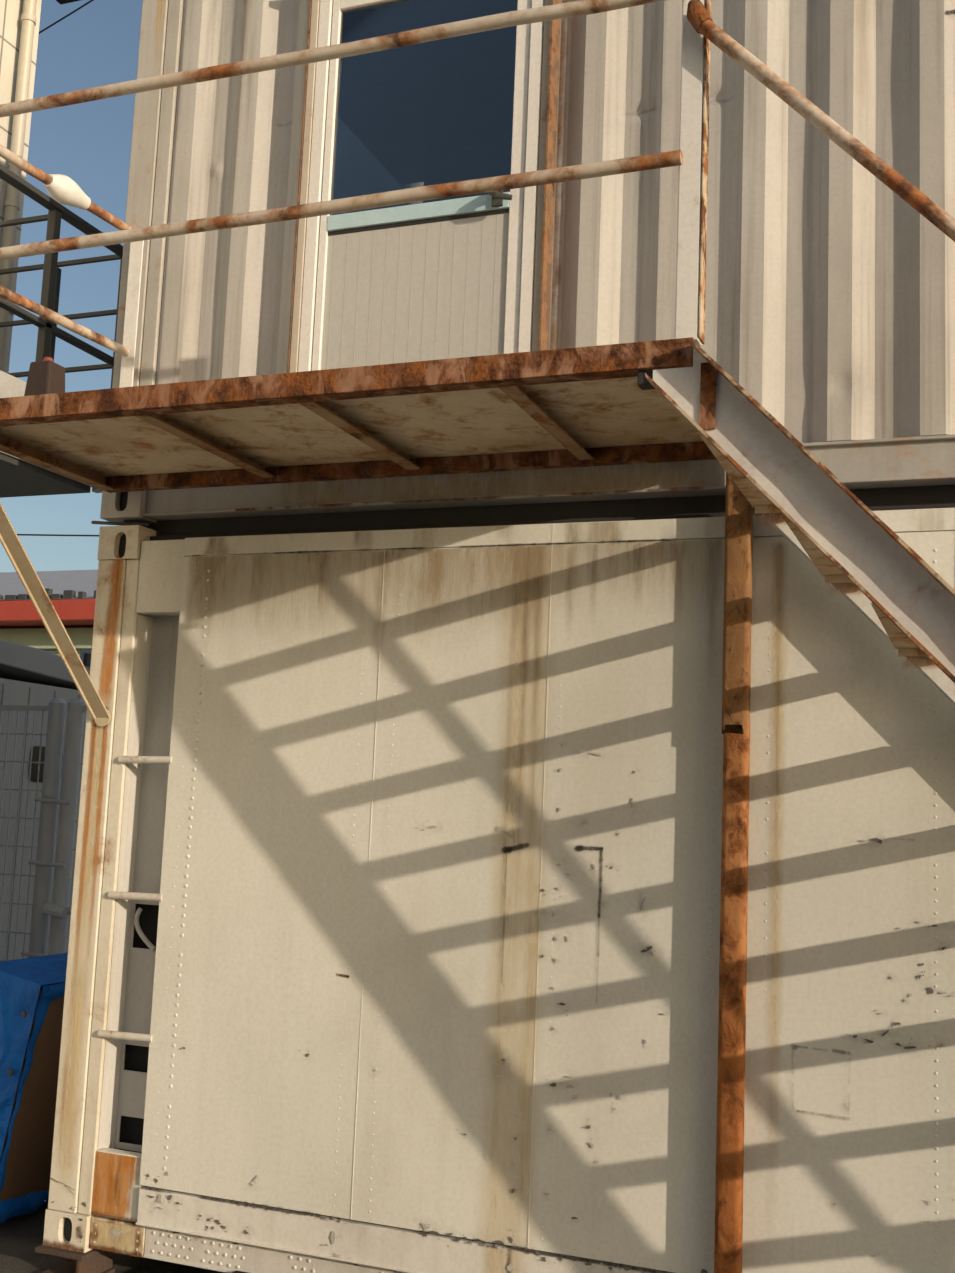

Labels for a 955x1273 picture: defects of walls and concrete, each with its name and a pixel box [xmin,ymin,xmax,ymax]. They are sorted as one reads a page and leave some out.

rust [100,558,123,695]
rust [78,719,107,923]
rust [43,1151,142,1258]
peeling [145,1172,182,1212]
peeling [166,1215,248,1246]
peeling [421,1223,664,1273]